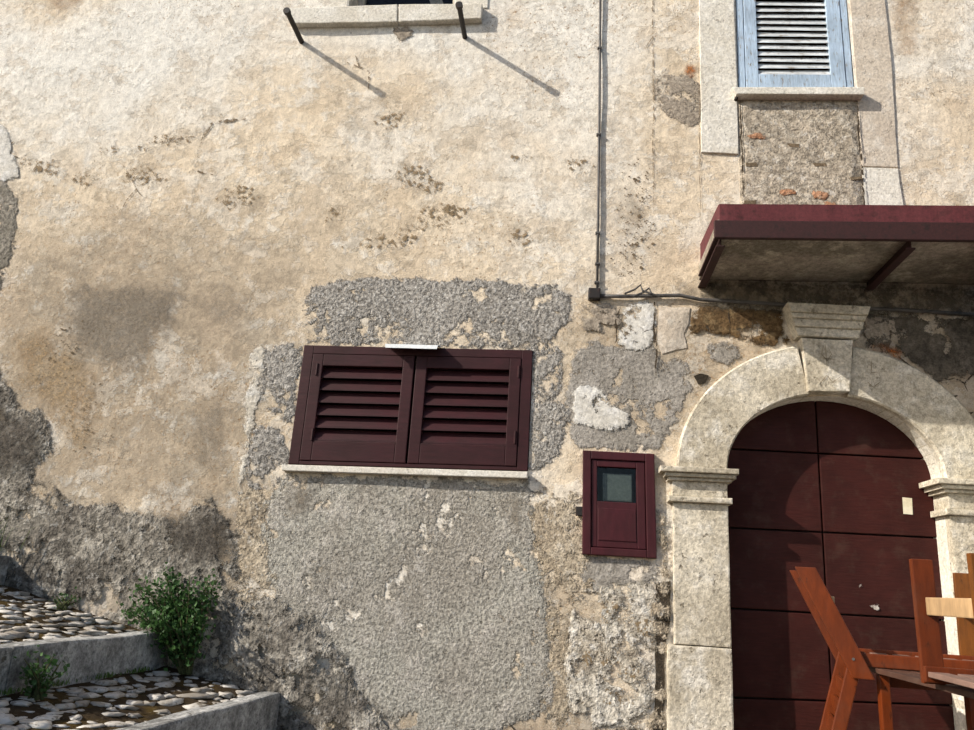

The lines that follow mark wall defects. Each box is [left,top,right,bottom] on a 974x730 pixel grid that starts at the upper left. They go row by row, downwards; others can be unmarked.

spalling [18,159,60,175]
spalling [124,165,167,185]
peeling [0,180,19,290]
peeling [564,302,793,452]
damp [0,411,38,469]
damp [166,516,228,560]